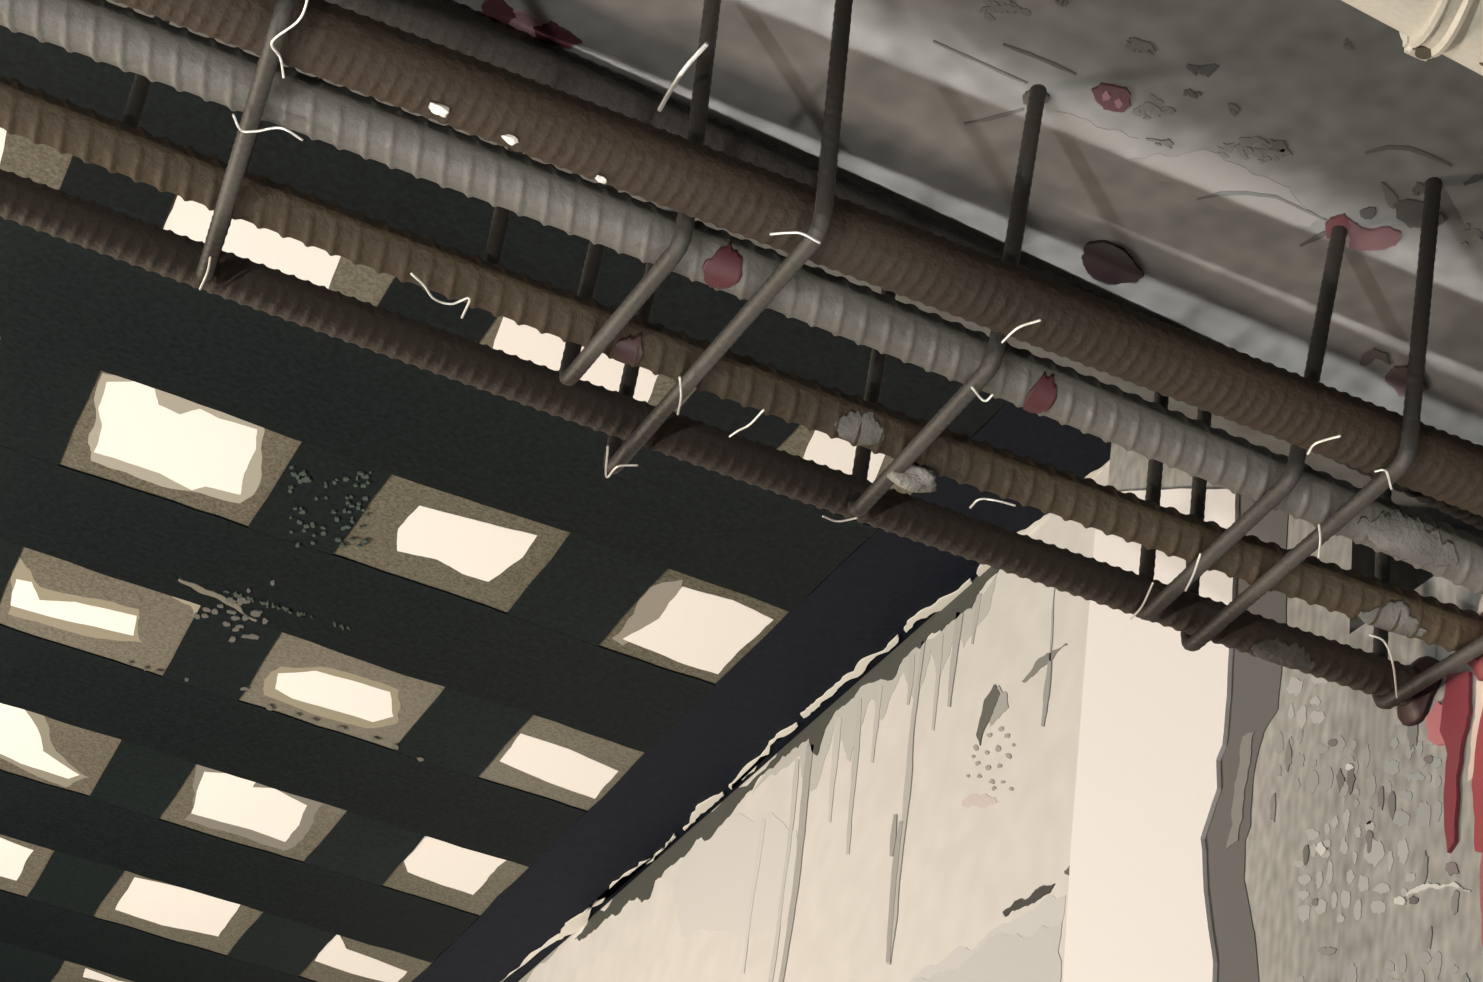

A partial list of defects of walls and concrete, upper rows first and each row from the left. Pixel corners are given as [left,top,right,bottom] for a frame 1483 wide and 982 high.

spalling [1360,182,1445,228]
leakage [1022,643,1067,727]
leakage [518,567,1000,982]
leakage [961,685,1015,809]
leakage [909,895,1066,982]